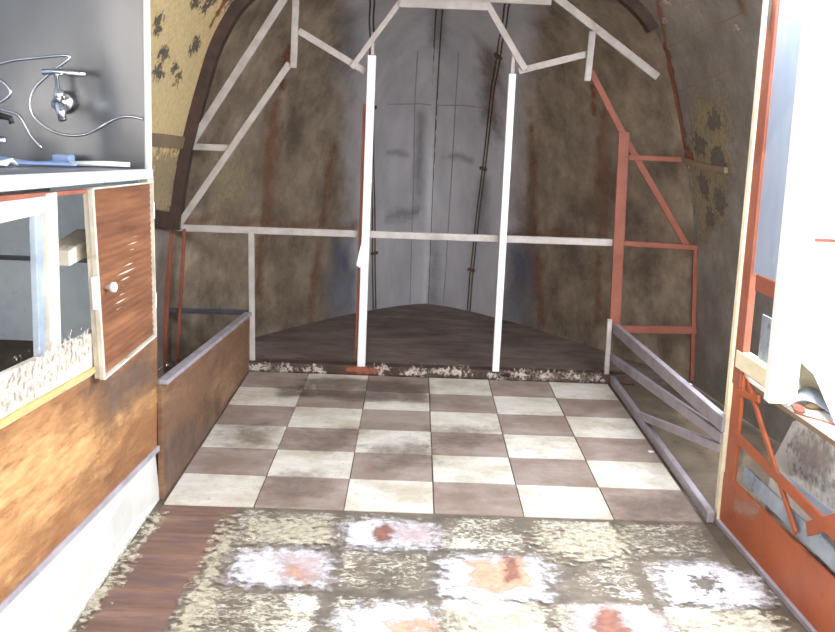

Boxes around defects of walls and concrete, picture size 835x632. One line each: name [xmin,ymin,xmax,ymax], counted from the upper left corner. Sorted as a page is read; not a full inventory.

corrosion [656,0,686,148]